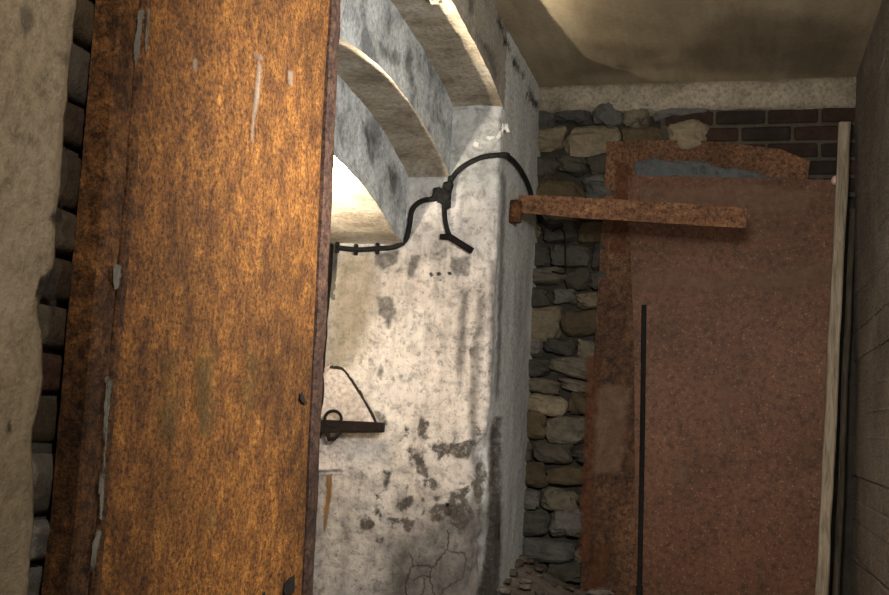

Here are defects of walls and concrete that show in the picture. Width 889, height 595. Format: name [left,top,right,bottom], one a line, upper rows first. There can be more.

flaking render [360,416,502,595]
crack [405,530,467,595]